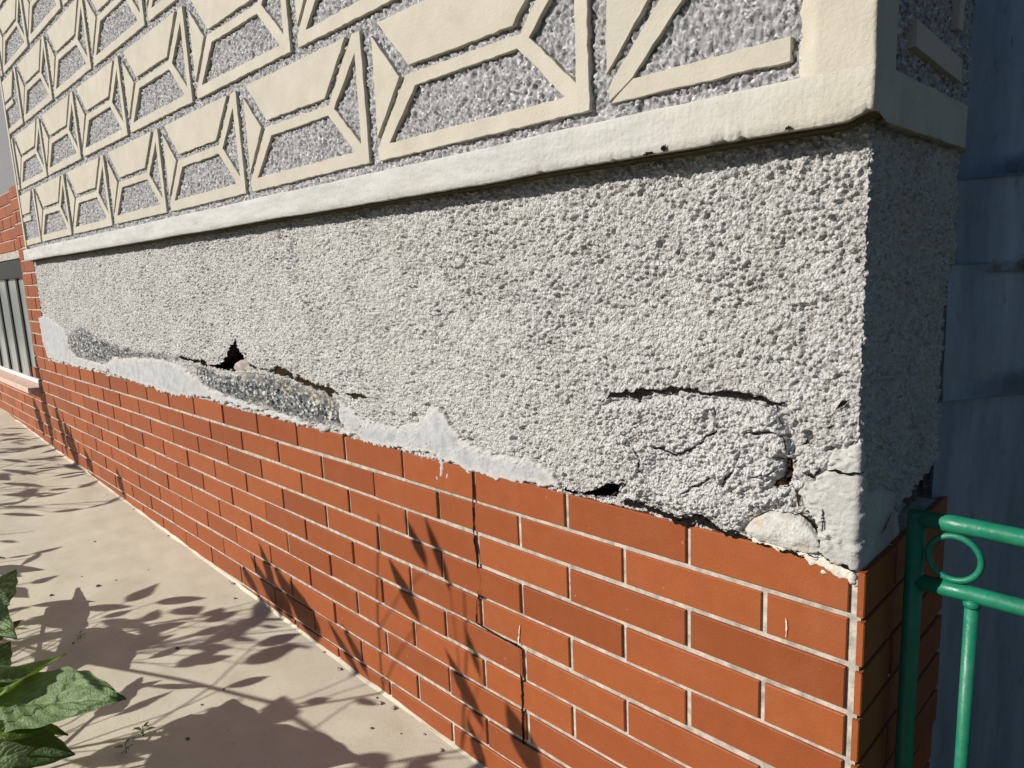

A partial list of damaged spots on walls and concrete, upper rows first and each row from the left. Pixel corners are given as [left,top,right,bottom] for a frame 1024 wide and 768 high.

peeling [68,328,177,361]
crack [180,356,207,366]
peeling [196,336,344,427]
crack [249,364,368,399]
crack [602,385,865,572]
crack [472,471,524,744]